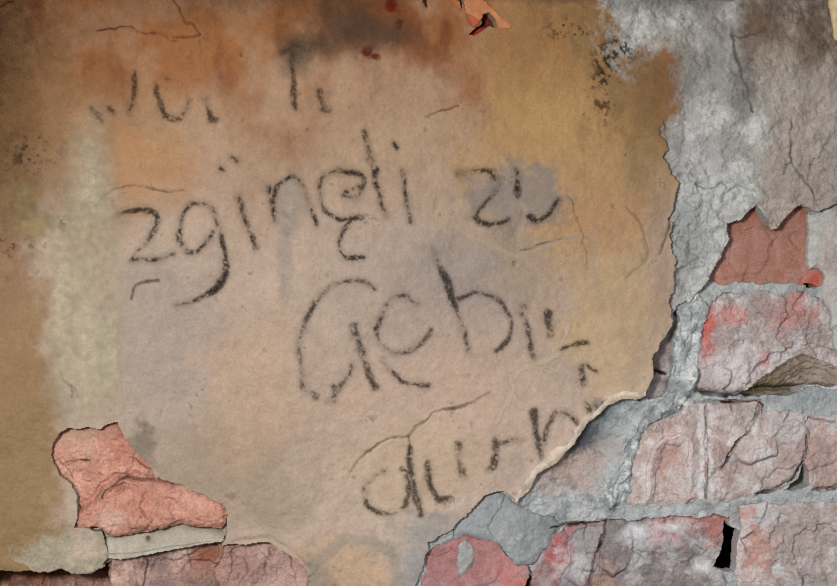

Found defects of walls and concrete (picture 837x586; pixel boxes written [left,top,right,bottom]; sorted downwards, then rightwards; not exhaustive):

spalling [0,422,308,586]
spalling [415,0,837,586]